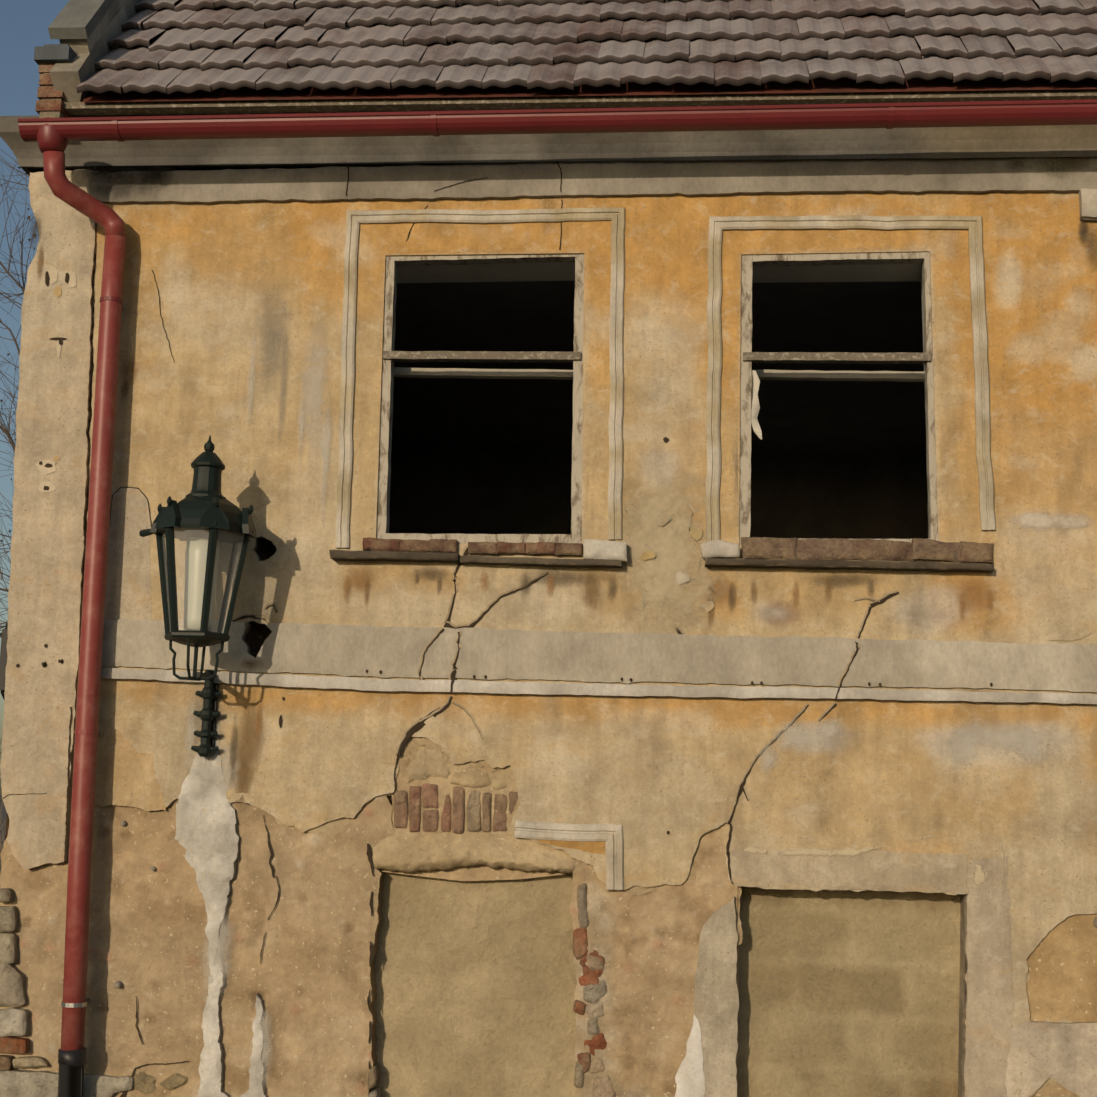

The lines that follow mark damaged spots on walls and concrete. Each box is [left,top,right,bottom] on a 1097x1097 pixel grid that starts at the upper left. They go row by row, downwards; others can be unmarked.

spalling [50,337,67,358]
spalling [45,266,76,297]
crack [152,270,174,360]
spalling [35,456,60,493]
crack [395,546,549,757]
crack [726,590,899,884]
spalling [0,838,68,1097]
crack [260,815,280,964]
spalling [83,733,518,1097]
spalling [570,826,743,1097]
spalling [1026,913,1097,1022]